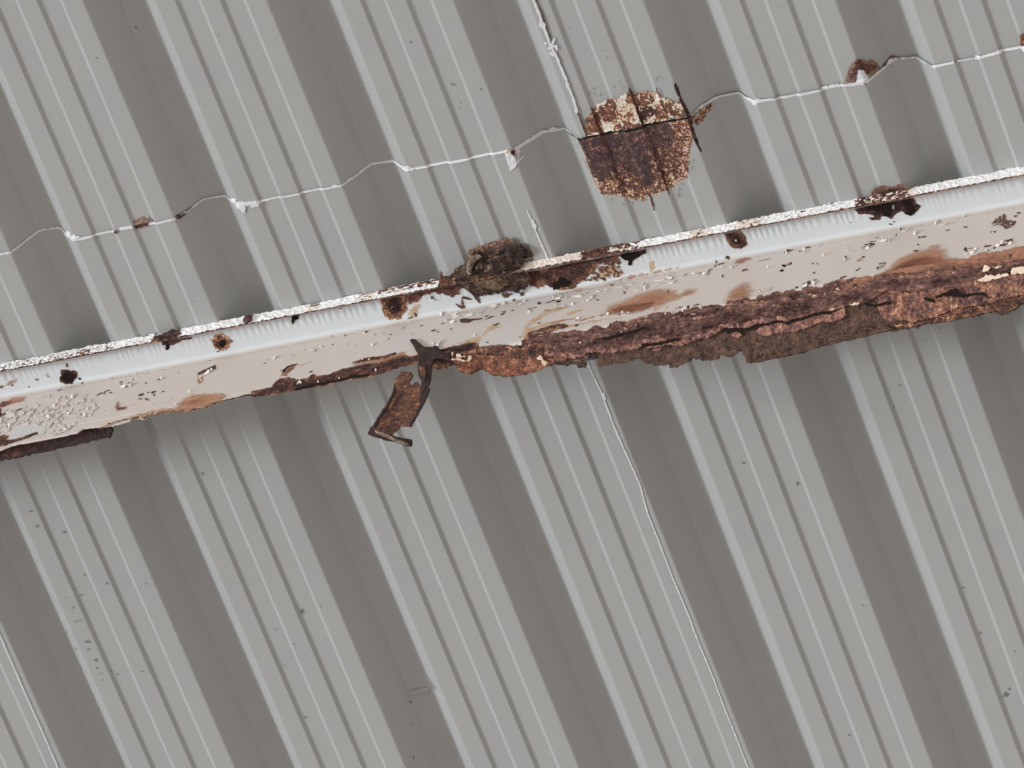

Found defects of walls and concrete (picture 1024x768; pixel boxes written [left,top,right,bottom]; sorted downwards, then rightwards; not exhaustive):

crack [698,46,1024,109]
crack [0,0,587,259]
corrosion [564,83,714,211]
corrosion [854,184,921,220]
corrosion [527,240,646,292]
peeling [420,167,1024,344]
corrosion [725,231,750,263]
peeling [0,333,155,370]
peeling [177,279,439,337]
corrosion [505,289,693,356]
peeling [0,372,176,439]
crack [587,361,748,768]